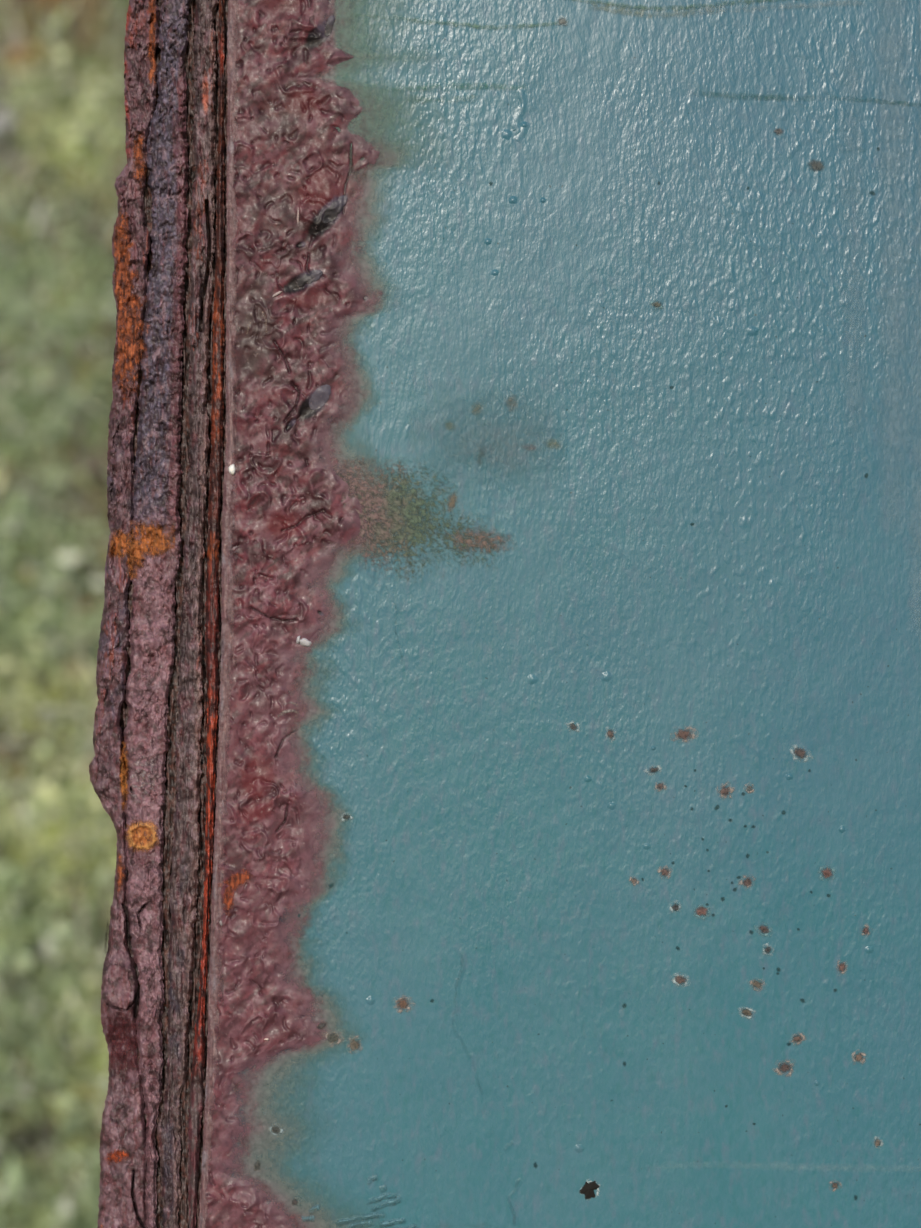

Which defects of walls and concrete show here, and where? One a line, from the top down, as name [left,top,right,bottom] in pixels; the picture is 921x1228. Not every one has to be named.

rust [89,0,501,1228]
peeling [296,636,312,647]
rust [675,727,695,742]